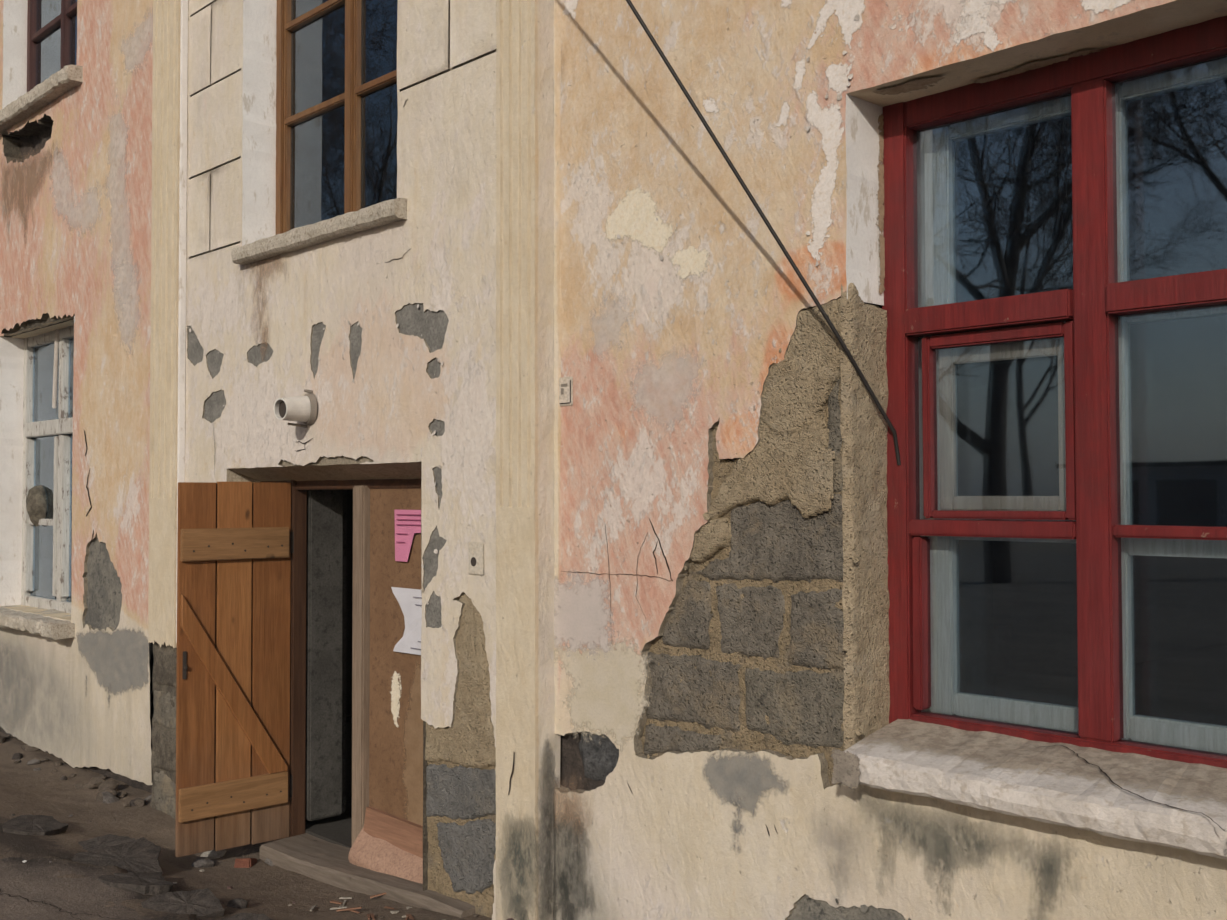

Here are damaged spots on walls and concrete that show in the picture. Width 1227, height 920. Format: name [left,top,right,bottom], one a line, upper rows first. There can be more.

spalling [2,114,53,163]
peeling [773,0,865,266]
spalling [1,313,75,338]
peeling [186,325,226,423]
peeling [394,303,449,379]
spalling [554,114,890,794]
spalling [82,532,122,631]
spalling [421,525,496,918]
leakage [704,754,786,847]
leakage [881,813,994,859]
crack [1036,745,1225,831]
spalling [785,894,911,920]